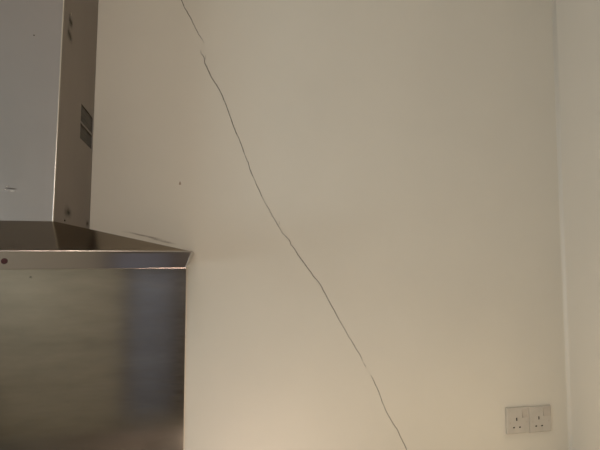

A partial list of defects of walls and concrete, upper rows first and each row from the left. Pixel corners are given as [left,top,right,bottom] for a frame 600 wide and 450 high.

crack [203,56,407,450]